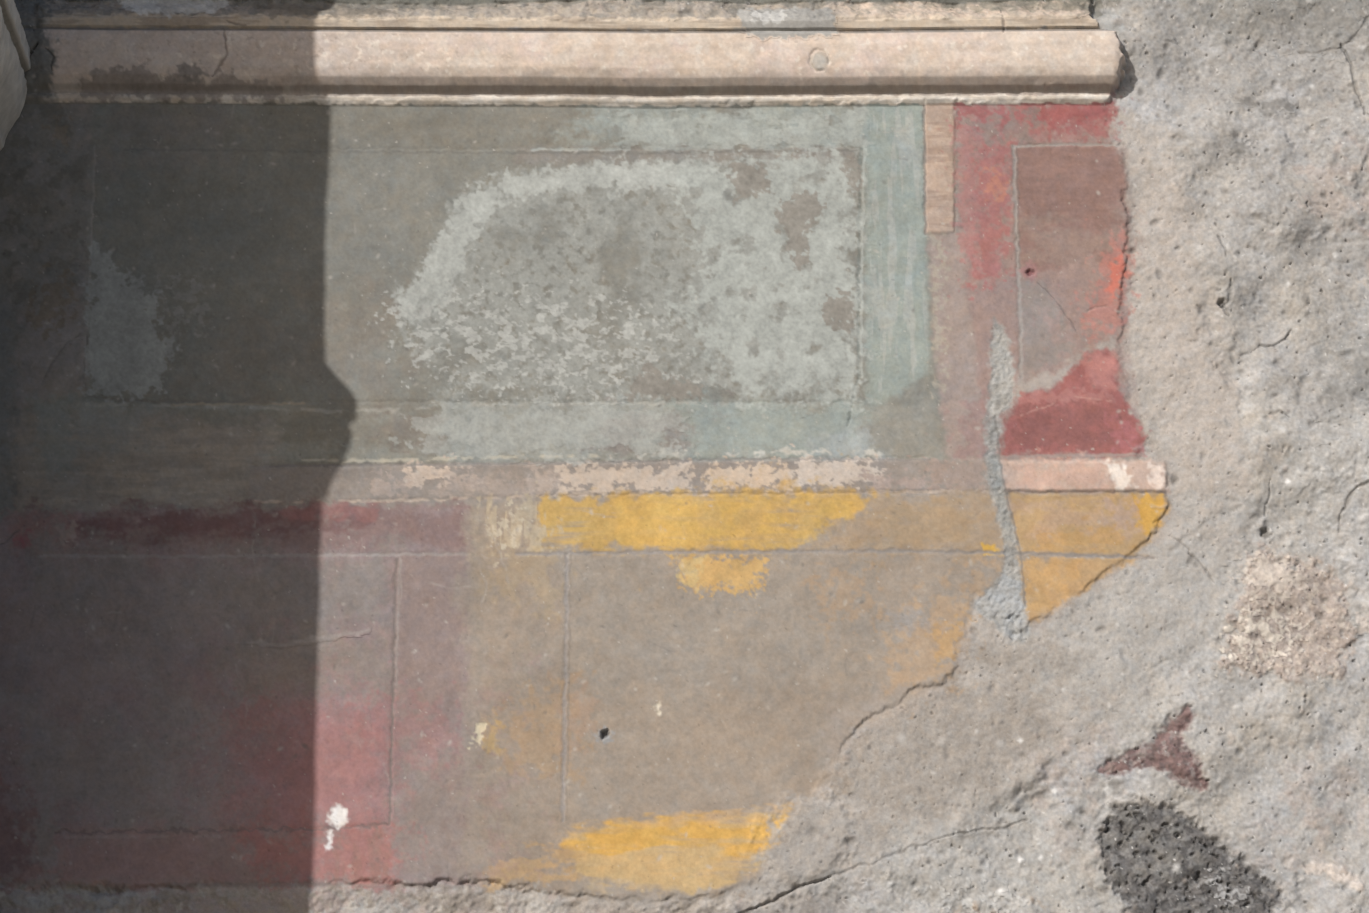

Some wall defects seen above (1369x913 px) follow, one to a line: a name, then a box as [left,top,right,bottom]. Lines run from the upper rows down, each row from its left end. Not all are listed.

crack [1296,19,1369,116]
crack [739,819,1030,913]